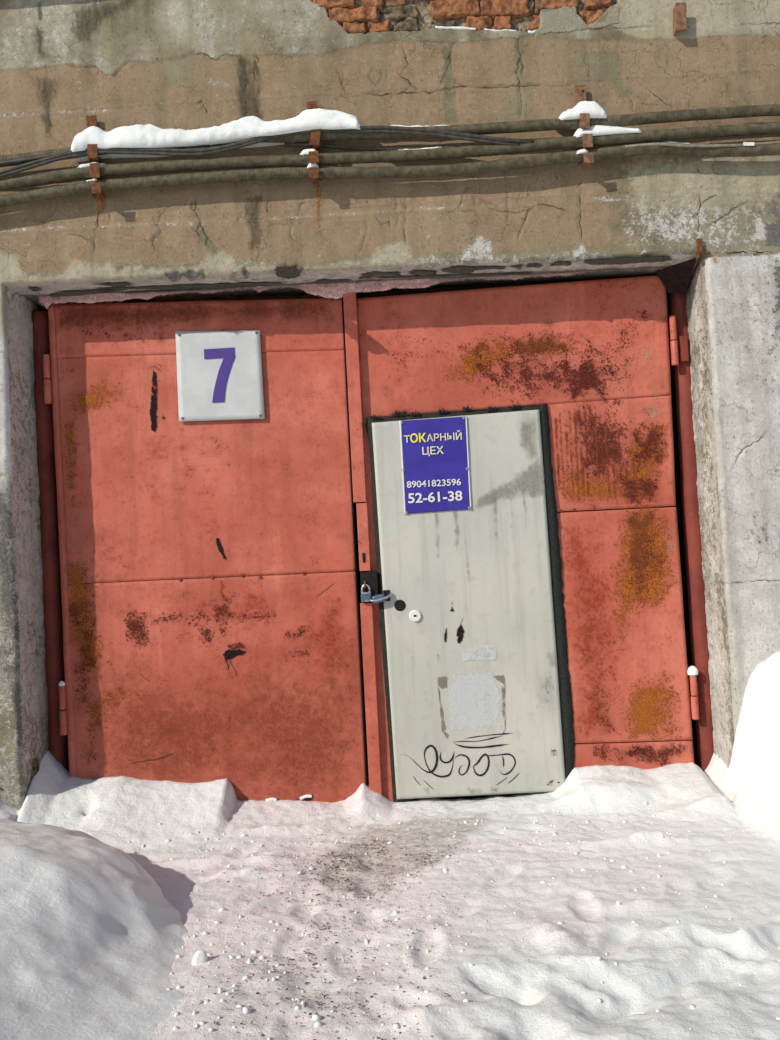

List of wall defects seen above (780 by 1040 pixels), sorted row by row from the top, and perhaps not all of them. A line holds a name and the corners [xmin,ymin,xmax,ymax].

flaking render [312,0,617,36]
water stain [237,55,260,118]
crack [336,46,566,108]
crack [152,195,211,253]
crack [448,173,582,238]
crack [695,166,747,228]
crack [704,248,777,256]
water stain [765,254,780,318]
rust [62,380,119,507]
rust [387,310,694,767]